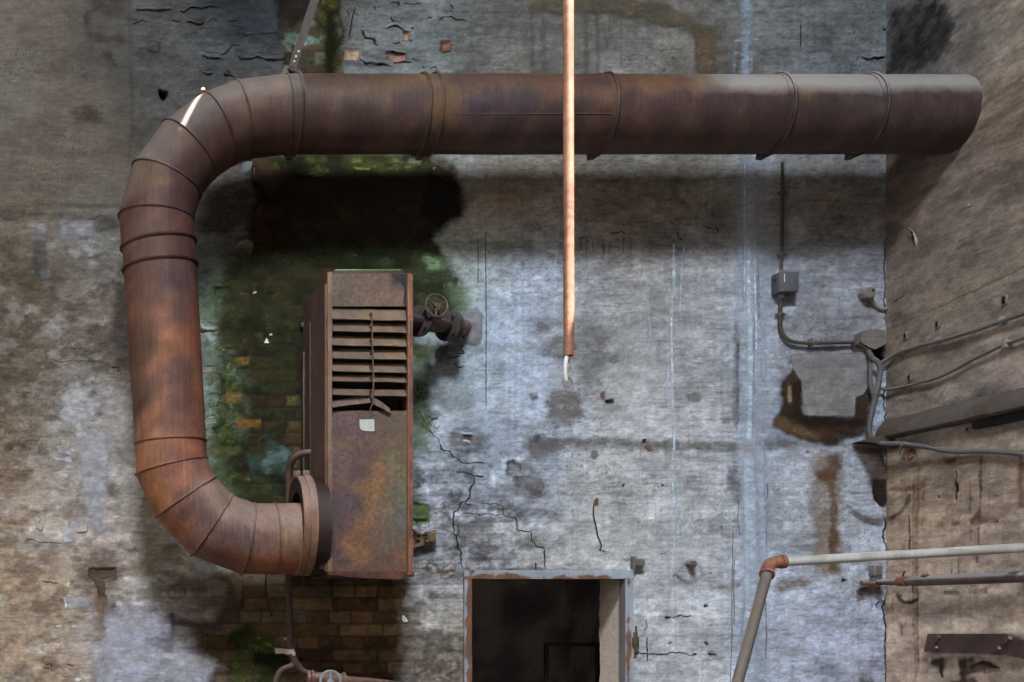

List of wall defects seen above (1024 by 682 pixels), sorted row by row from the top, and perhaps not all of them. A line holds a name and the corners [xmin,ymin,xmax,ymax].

flaking render [276,0,410,74]
water stain [426,175,463,219]
mould [246,440,294,474]
crack [413,385,546,569]
crack [635,615,697,662]
crack [876,586,887,682]